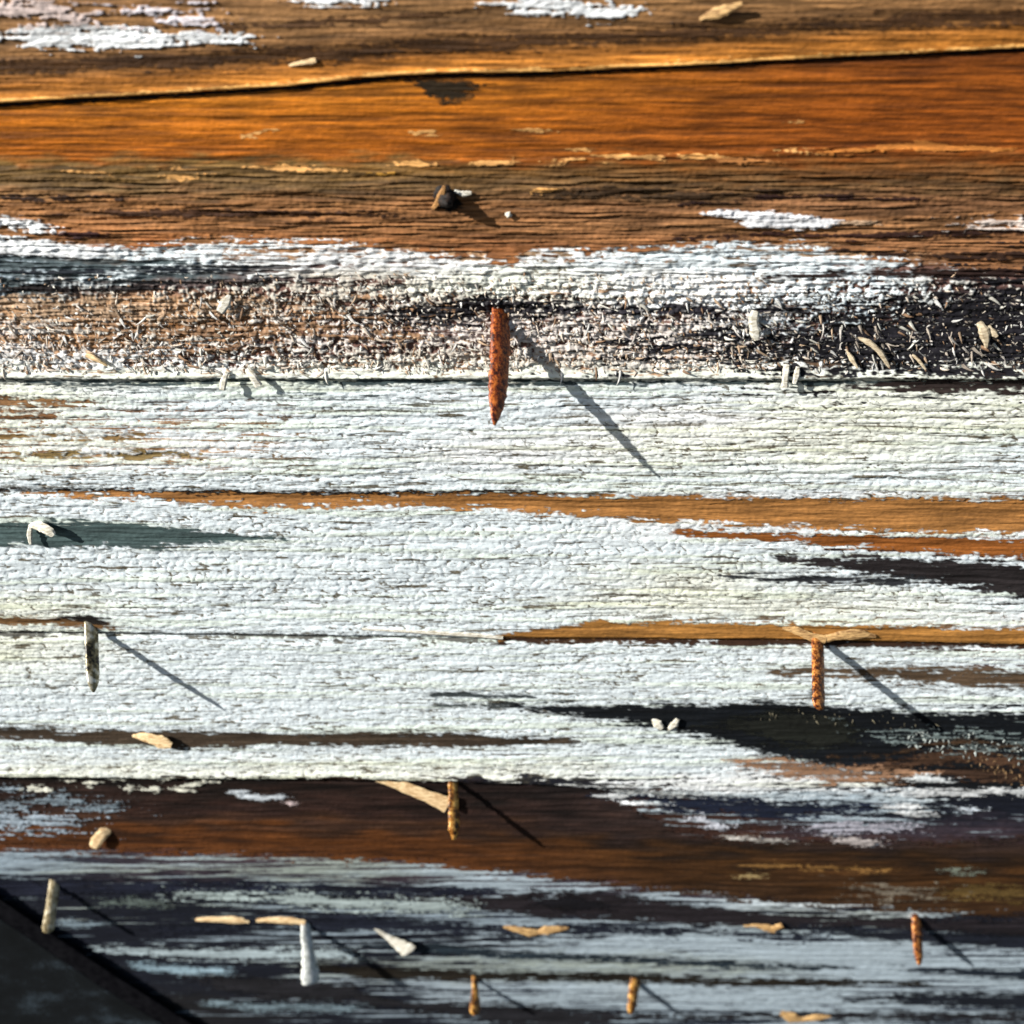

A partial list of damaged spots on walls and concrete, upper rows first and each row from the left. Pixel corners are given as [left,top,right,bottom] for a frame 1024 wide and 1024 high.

peeling [0,0,1024,411]
peeling [0,488,1024,605]
peeling [495,619,1024,652]
peeling [0,699,1024,918]
peeling [55,917,110,929]
peeling [87,943,365,976]
peeling [201,1000,356,1014]